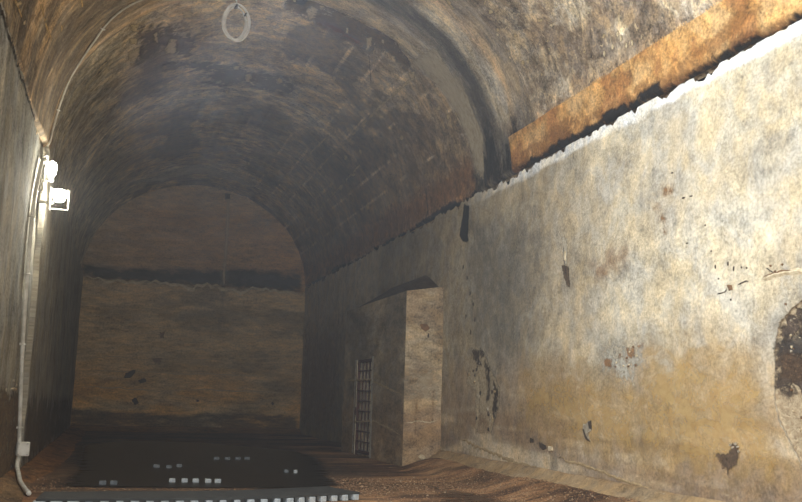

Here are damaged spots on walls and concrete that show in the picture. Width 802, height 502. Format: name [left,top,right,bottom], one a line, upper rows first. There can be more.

leakage [128,23,296,94]
leakage [82,34,771,291]
flaking render [562,237,570,287]
leakage [0,380,297,478]
spalling [467,349,500,433]
spalling [716,443,740,475]
spalling [774,300,802,465]